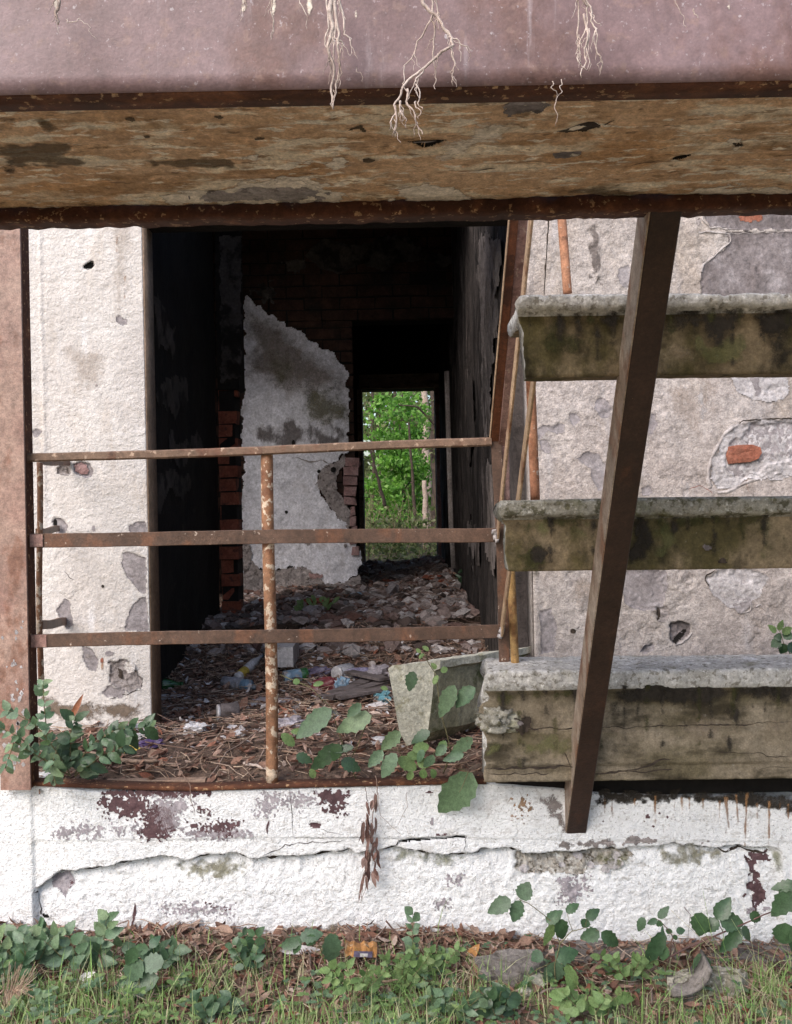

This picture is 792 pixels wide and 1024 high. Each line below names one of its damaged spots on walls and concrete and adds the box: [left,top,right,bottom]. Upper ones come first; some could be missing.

leakage [0,120,84,173]
spalling [698,214,792,296]
spalling [706,417,792,494]
spalling [315,454,361,529]
leakage [629,515,689,564]
spalling [623,570,692,645]
spalling [82,646,142,698]
peeling [48,789,350,843]
corrosion [719,793,771,838]
crack [384,835,614,855]
crack [673,842,766,854]
spalling [742,848,772,914]